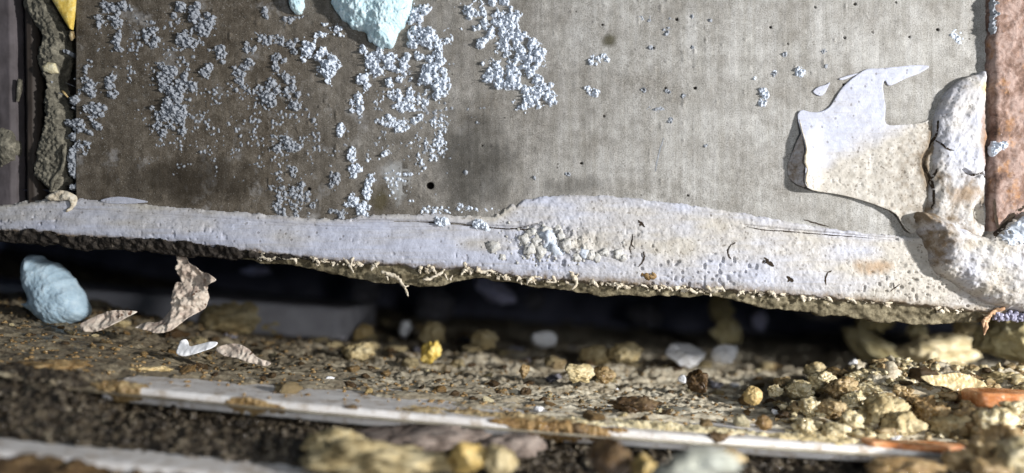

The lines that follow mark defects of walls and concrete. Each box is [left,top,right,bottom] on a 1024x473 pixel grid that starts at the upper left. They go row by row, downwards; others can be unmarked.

efflorescence [51,0,558,232]
peeling [813,73,858,96]
crack [922,120,954,209]
corrosion [984,0,1024,232]